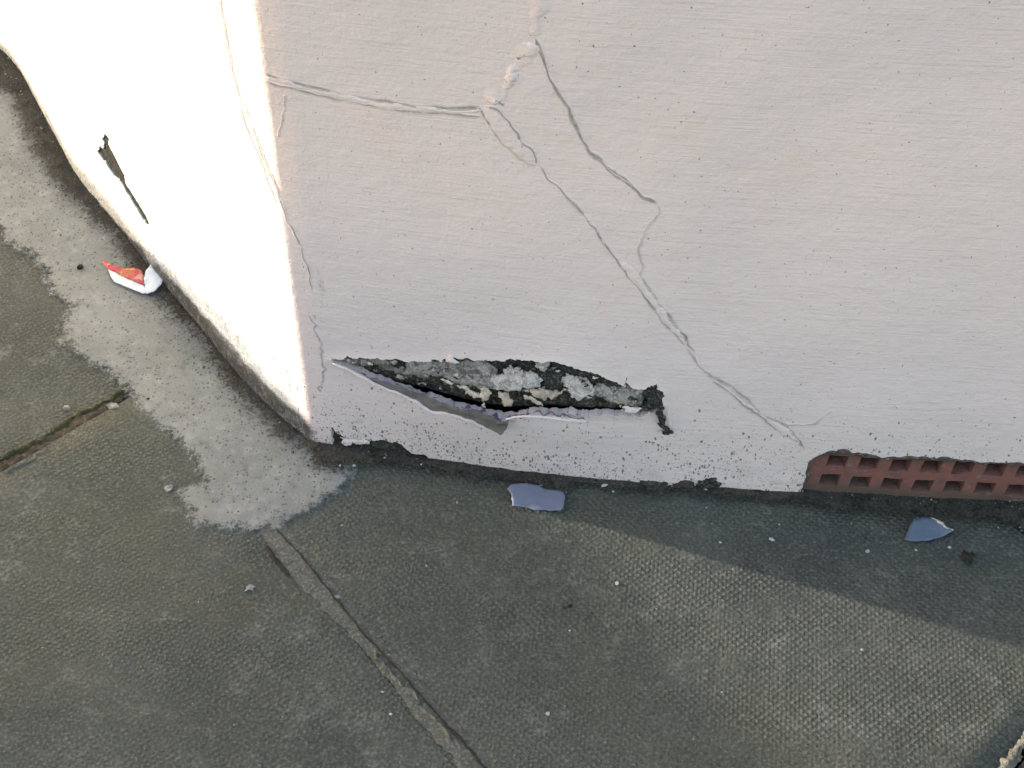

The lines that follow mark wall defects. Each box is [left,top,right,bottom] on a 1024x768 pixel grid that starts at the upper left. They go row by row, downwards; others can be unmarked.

crack [220,0,832,449]